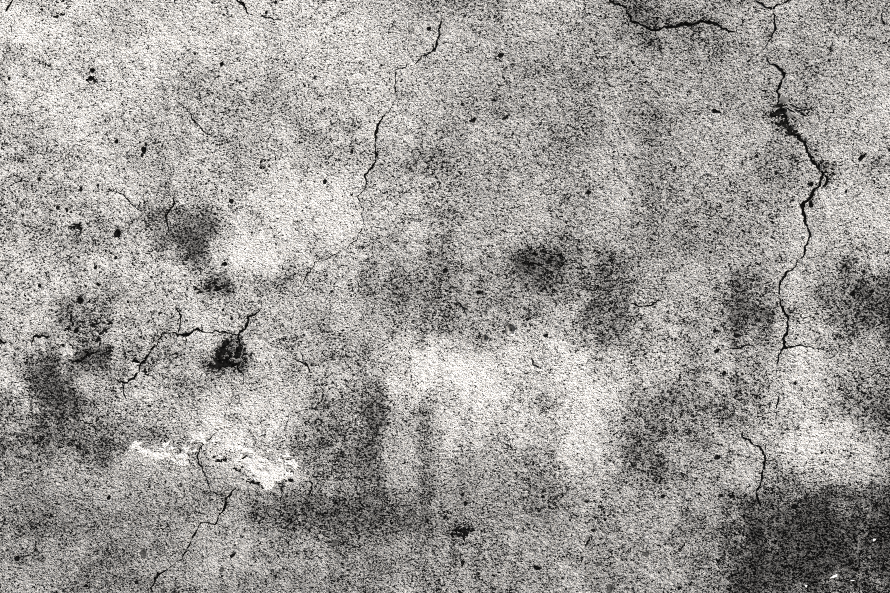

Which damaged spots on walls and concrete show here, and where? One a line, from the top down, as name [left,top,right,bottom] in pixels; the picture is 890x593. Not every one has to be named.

crack [609,0,737,33]
crack [751,0,791,102]
water stain [0,289,18,315]
crack [117,2,447,404]
crack [729,132,828,367]
water stain [0,322,174,479]
crack [150,430,238,593]
peeling [127,420,307,495]
water stain [151,368,468,561]
crack [706,395,780,504]
water stain [608,229,890,593]